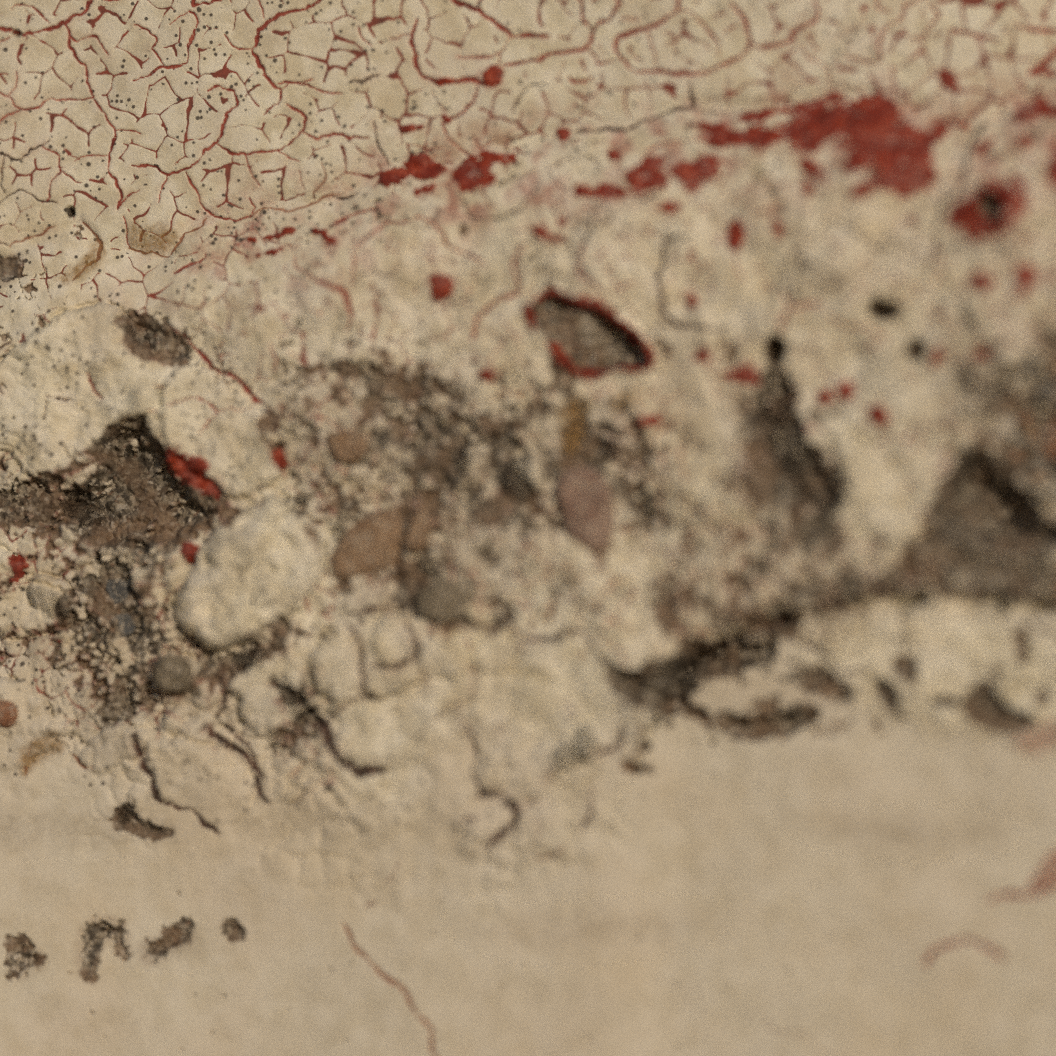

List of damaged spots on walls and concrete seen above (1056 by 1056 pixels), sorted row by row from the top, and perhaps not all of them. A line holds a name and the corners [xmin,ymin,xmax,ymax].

peeling [452,150,517,193]
peeling [589,90,955,202]
spalling [0,415,221,728]
spalling [342,350,553,538]
crack [0,0,1056,835]
spalling [729,367,846,556]
spalling [897,447,1056,594]
spalling [606,635,854,742]
spalling [931,682,1049,735]
spalling [112,803,169,836]
crack [456,712,593,860]
crack [342,923,436,1056]